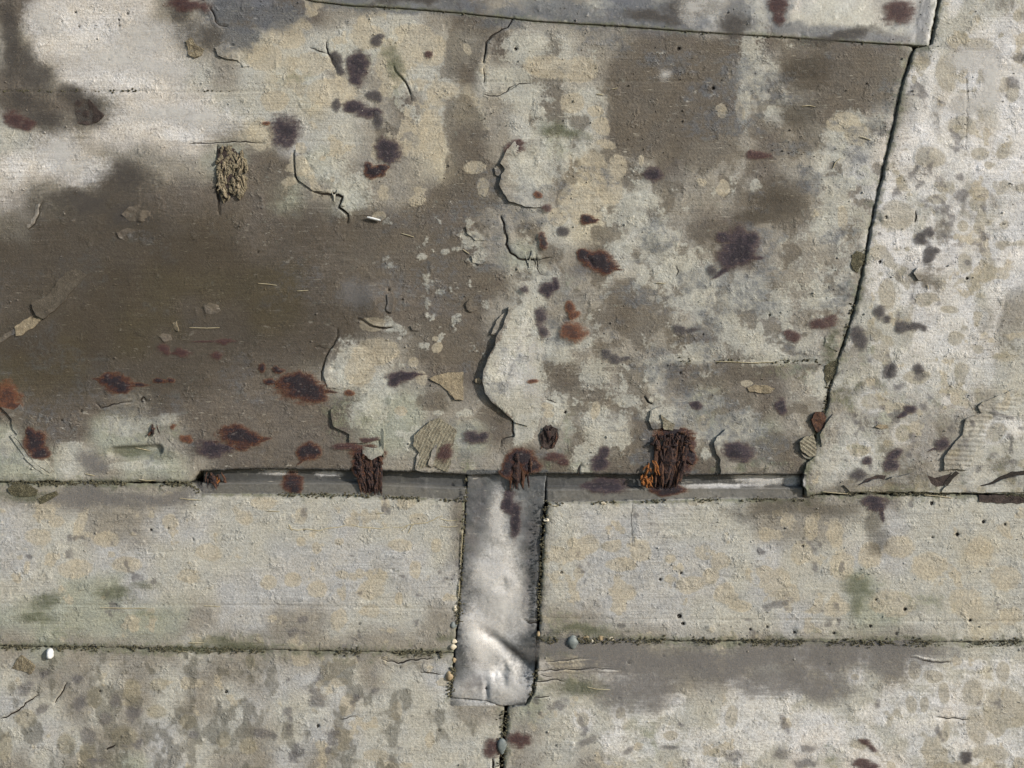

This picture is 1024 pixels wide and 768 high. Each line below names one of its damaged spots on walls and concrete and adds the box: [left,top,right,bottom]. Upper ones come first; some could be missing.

damp [50,161,150,224]
crack [294,157,356,225]
rust [577,249,622,276]
rust [520,277,589,343]
rust [258,364,355,403]
rust [23,427,51,460]
rust [148,424,271,458]
rust [282,437,387,496]
spalling [413,418,457,473]
crack [501,419,519,443]
rust [498,425,569,537]
rust [640,427,699,497]